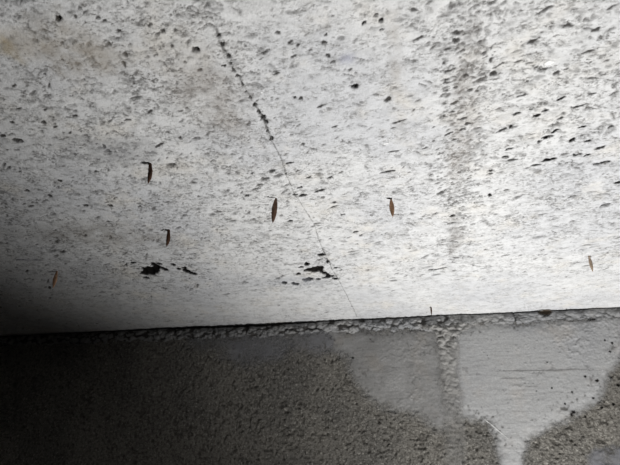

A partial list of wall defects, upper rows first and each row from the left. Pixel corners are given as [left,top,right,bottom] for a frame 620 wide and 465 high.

crack [218,33,274,140]
spalling [140,262,197,278]
spalling [282,253,337,285]